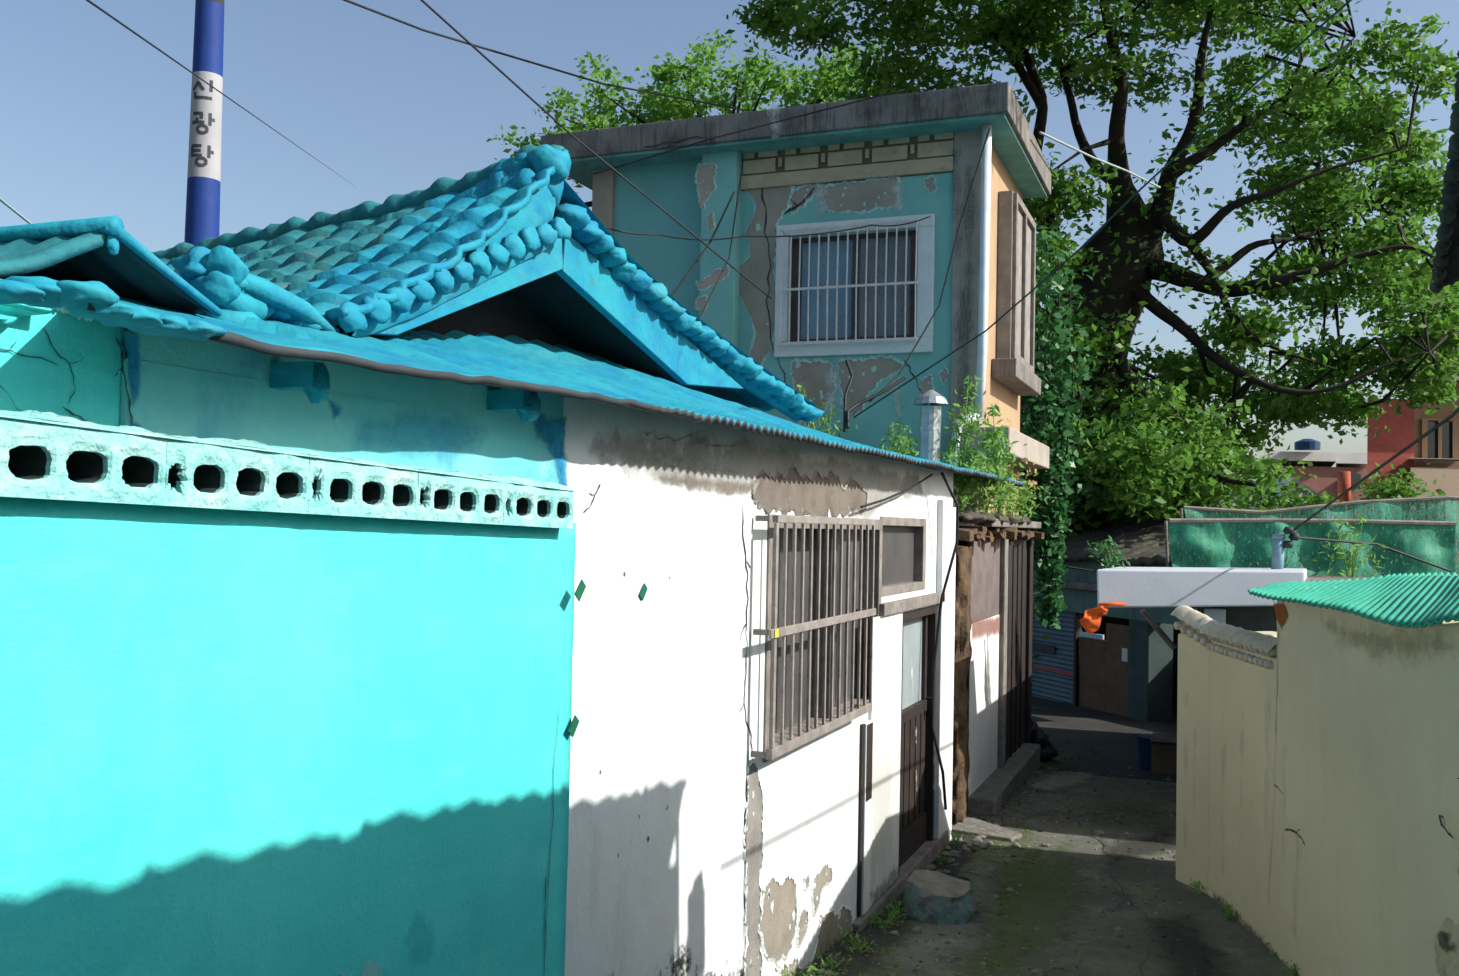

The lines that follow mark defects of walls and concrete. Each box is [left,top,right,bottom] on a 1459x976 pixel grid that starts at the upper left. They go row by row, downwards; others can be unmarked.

peeling [695,162,718,232]
peeling [695,176,902,366]
crack [0,327,133,426]
peeling [789,354,905,429]
peeling [917,366,950,395]
water stain [596,436,922,519]
spalling [752,464,868,518]
crack [739,502,753,973]
peeling [743,760,853,976]
water stain [660,945,744,976]